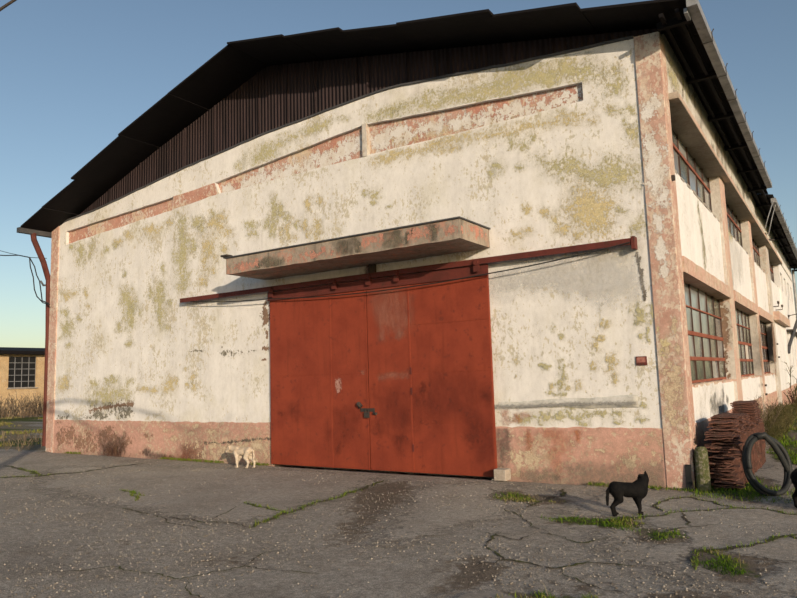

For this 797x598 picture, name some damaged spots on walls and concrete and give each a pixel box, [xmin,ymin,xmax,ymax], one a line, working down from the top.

peeling [222,51,673,279]
peeling [69,230,133,268]
peeling [142,210,234,333]
peeling [115,270,142,347]
flaking render [219,300,270,361]
peeling [629,301,671,357]
peeling [538,359,582,396]
flaking render [55,367,197,456]
flaking render [163,424,274,466]